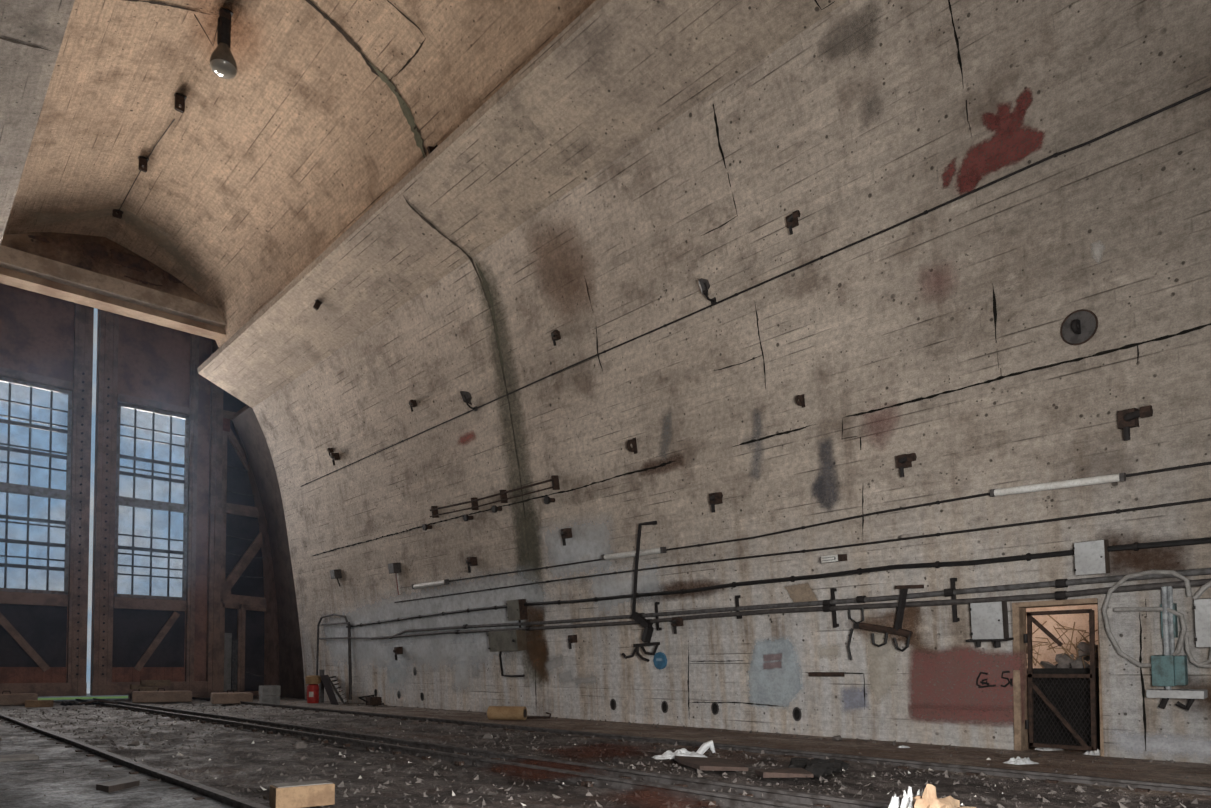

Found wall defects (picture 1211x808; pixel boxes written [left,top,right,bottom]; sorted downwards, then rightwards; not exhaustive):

crack [124,0,210,15]
crack [305,0,427,158]
crack [948,0,972,137]
crack [403,195,498,346]
crack [313,461,675,556]
damp [480,273,538,610]
damp [813,441,837,510]
crack [732,283,1211,450]
crack [1139,598,1147,751]